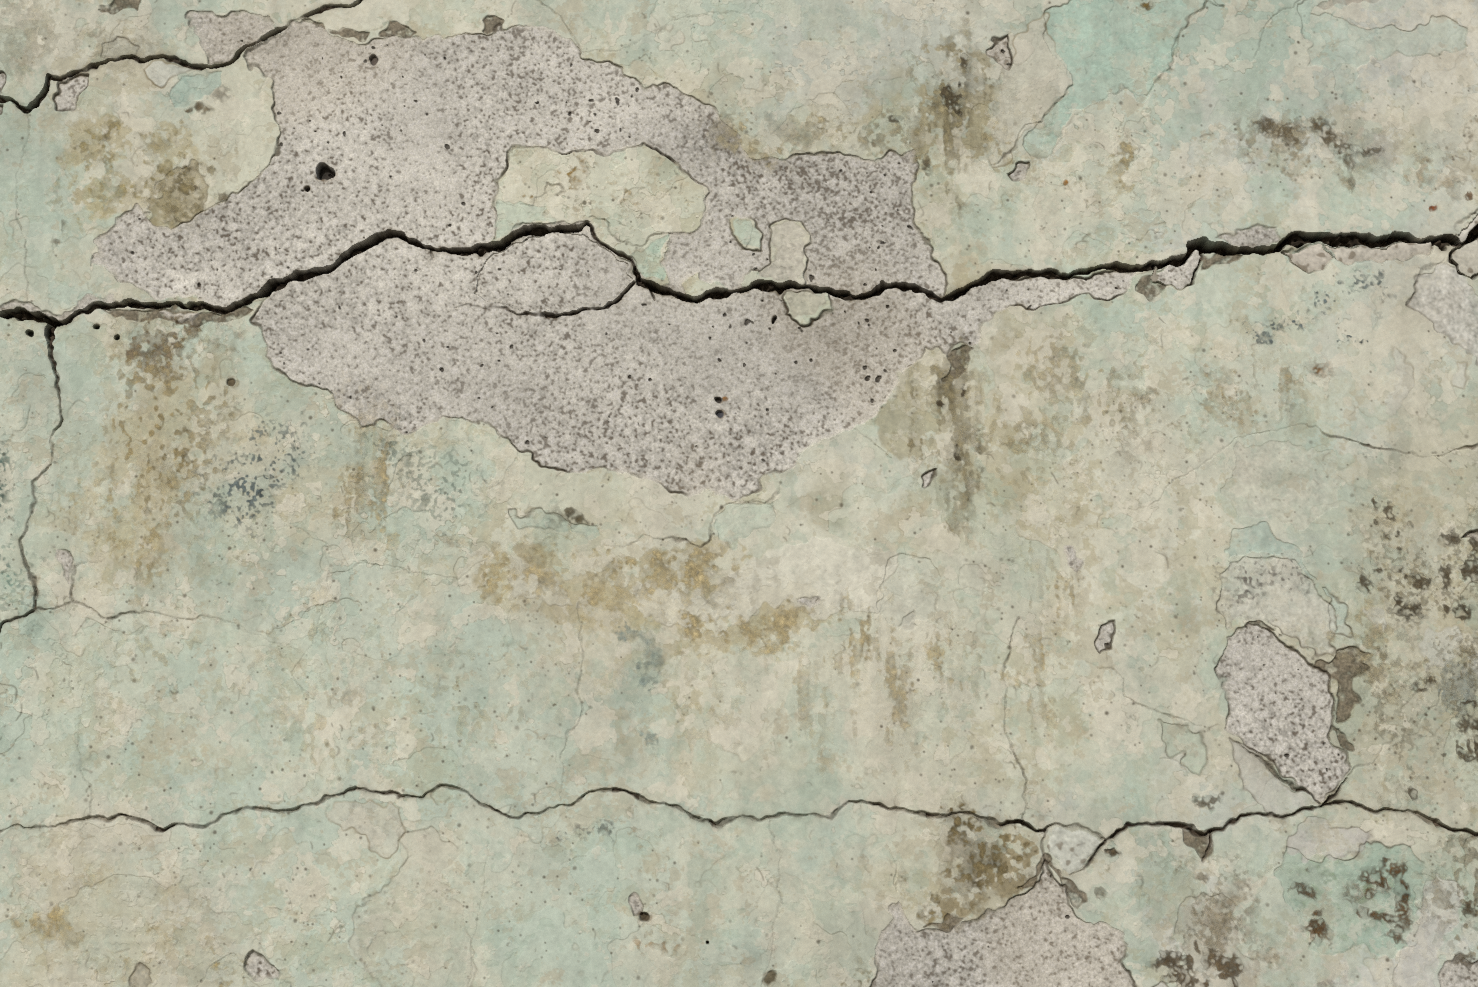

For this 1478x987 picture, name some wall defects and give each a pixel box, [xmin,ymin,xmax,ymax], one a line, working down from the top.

spalling [0,0,1333,632]
crack [0,0,1478,701]
spalling [1461,530,1478,542]
spalling [1214,522,1387,816]
peeling [1418,582,1478,677]
crack [0,602,1478,941]
peeling [1443,696,1478,803]
spalling [870,828,1138,987]
peeling [1183,829,1214,863]
peeling [1175,893,1262,987]
peeling [1274,842,1478,987]